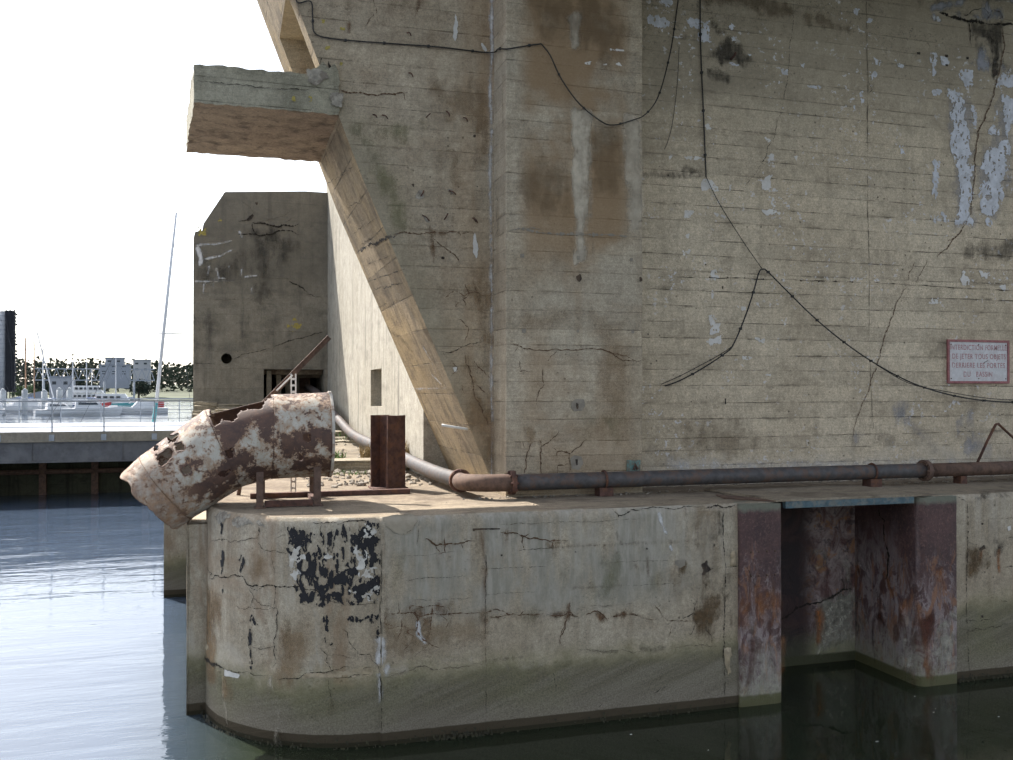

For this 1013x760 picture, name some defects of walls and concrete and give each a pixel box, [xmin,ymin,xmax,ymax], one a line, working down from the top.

rust [918,605,934,672]